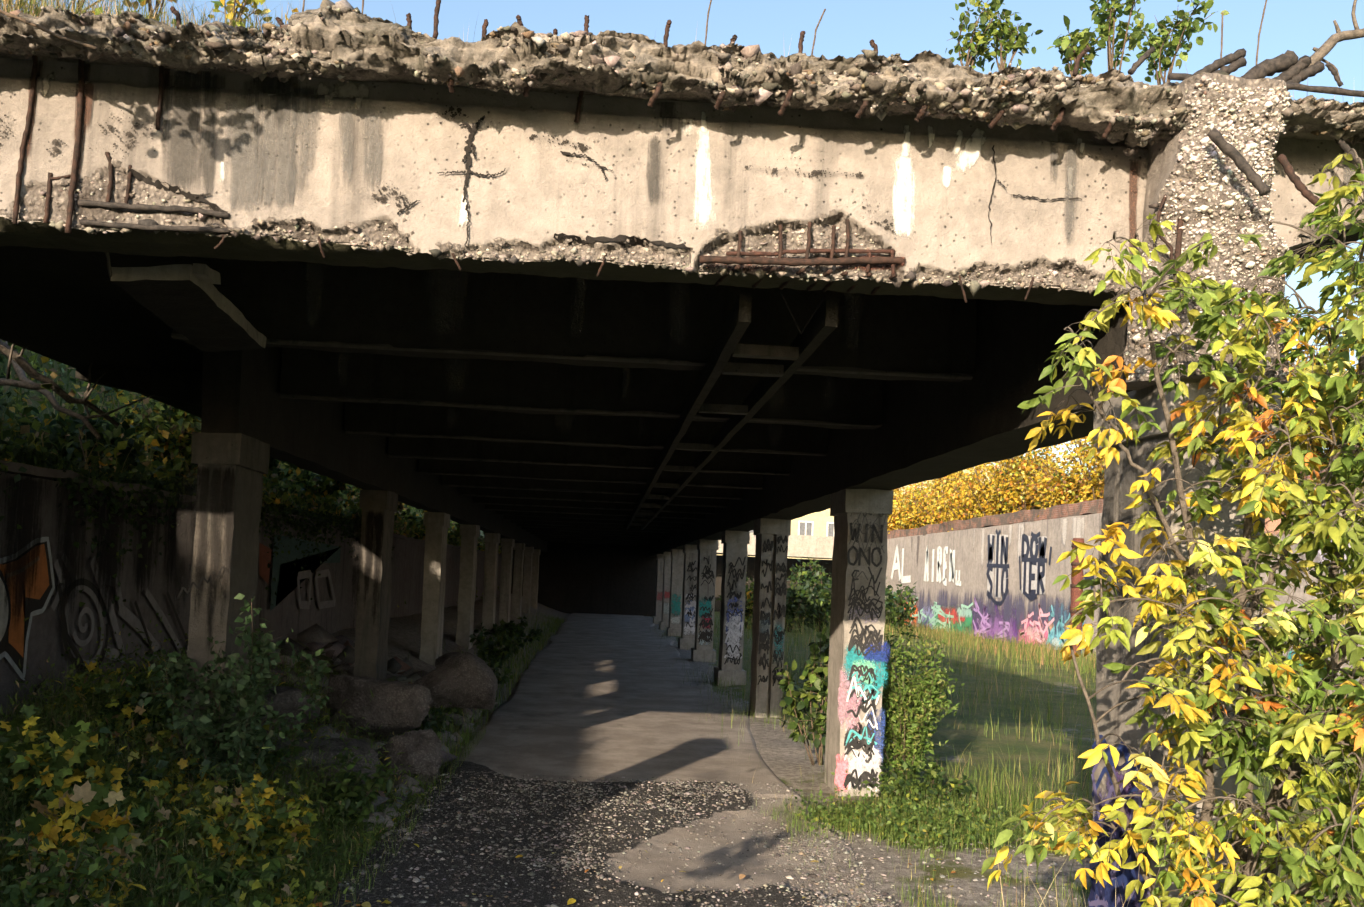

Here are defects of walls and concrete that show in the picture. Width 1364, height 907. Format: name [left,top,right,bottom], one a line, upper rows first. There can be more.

corrosion [26,62,43,154]
corrosion [75,64,94,199]
leakage [162,71,382,209]
crack [397,192,420,215]
crack [437,115,506,247]
spalling [0,0,1194,303]
leakage [647,102,713,225]
efflorescence [893,125,915,236]
efflorescence [943,128,986,187]
crack [988,145,1082,243]
spalling [1207,128,1271,196]
spalling [1267,95,1364,165]